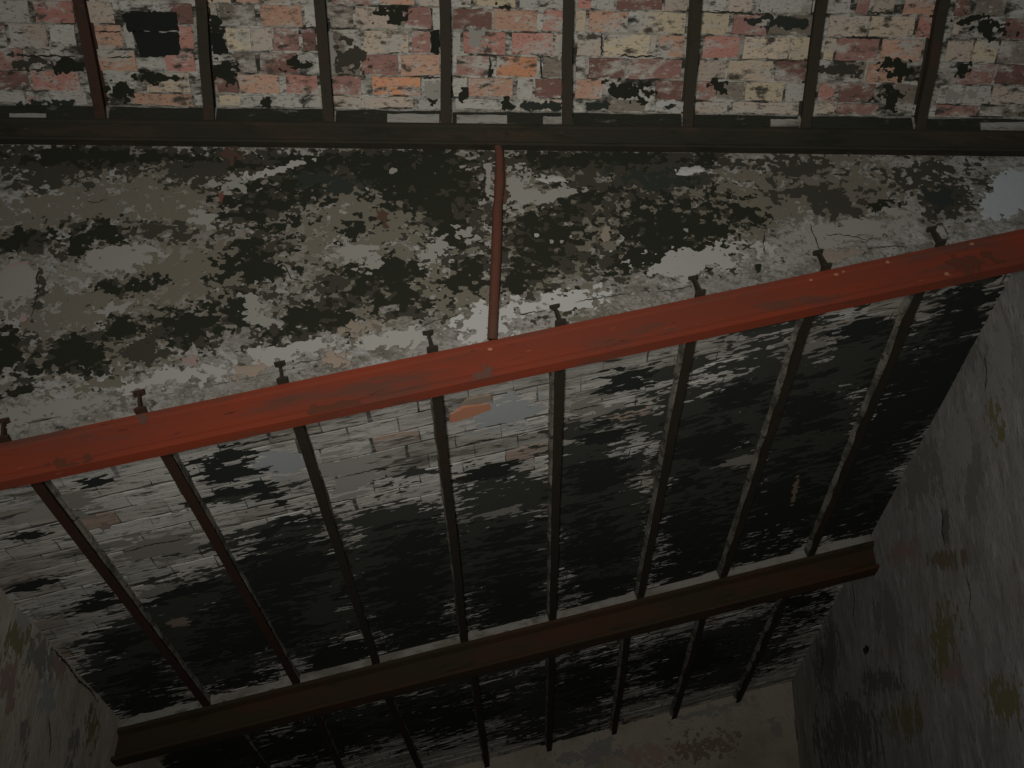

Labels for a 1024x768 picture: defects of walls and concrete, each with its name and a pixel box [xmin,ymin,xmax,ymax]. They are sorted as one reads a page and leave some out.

hole [121,11,180,58]
spalling [209,33,228,55]
spalling [430,30,440,55]
rust [601,225,611,242]
spalling [337,317,382,338]
spalling [449,394,492,423]